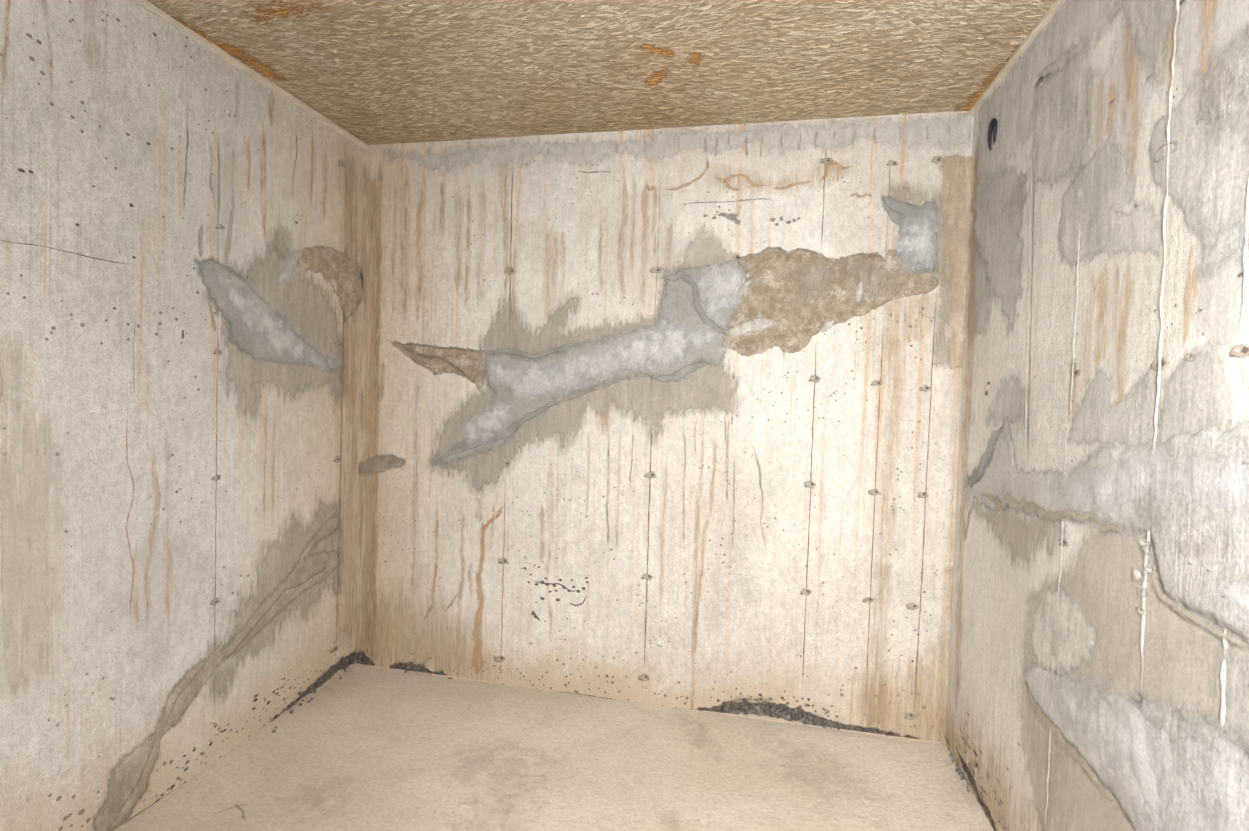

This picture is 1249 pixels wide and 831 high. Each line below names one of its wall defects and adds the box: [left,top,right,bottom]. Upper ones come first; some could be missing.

spalling [279,245,363,321]
spalling [724,247,939,361]
damp [93,501,344,831]
rust [461,507,502,670]
damp [964,419,1249,831]